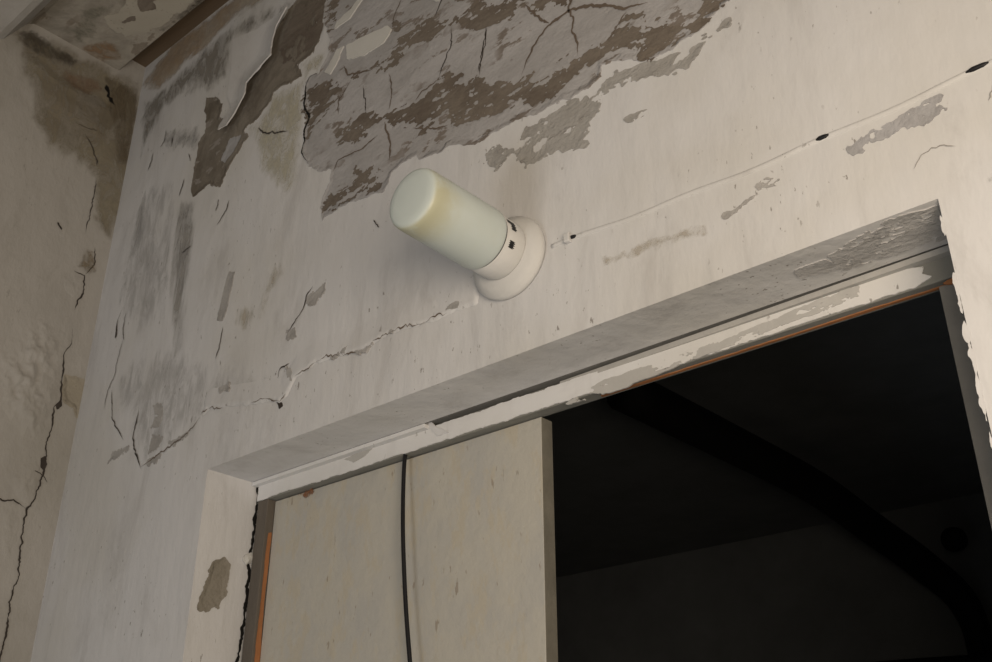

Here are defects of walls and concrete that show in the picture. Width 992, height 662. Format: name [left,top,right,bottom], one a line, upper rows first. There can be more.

flaking render [191,0,732,221]
flaking render [846,94,948,156]
crack [0,124,98,659]
crack [105,310,196,468]
crack [278,283,326,373]
flaking render [566,286,860,405]
flaking render [197,557,231,613]
crack [235,487,258,662]